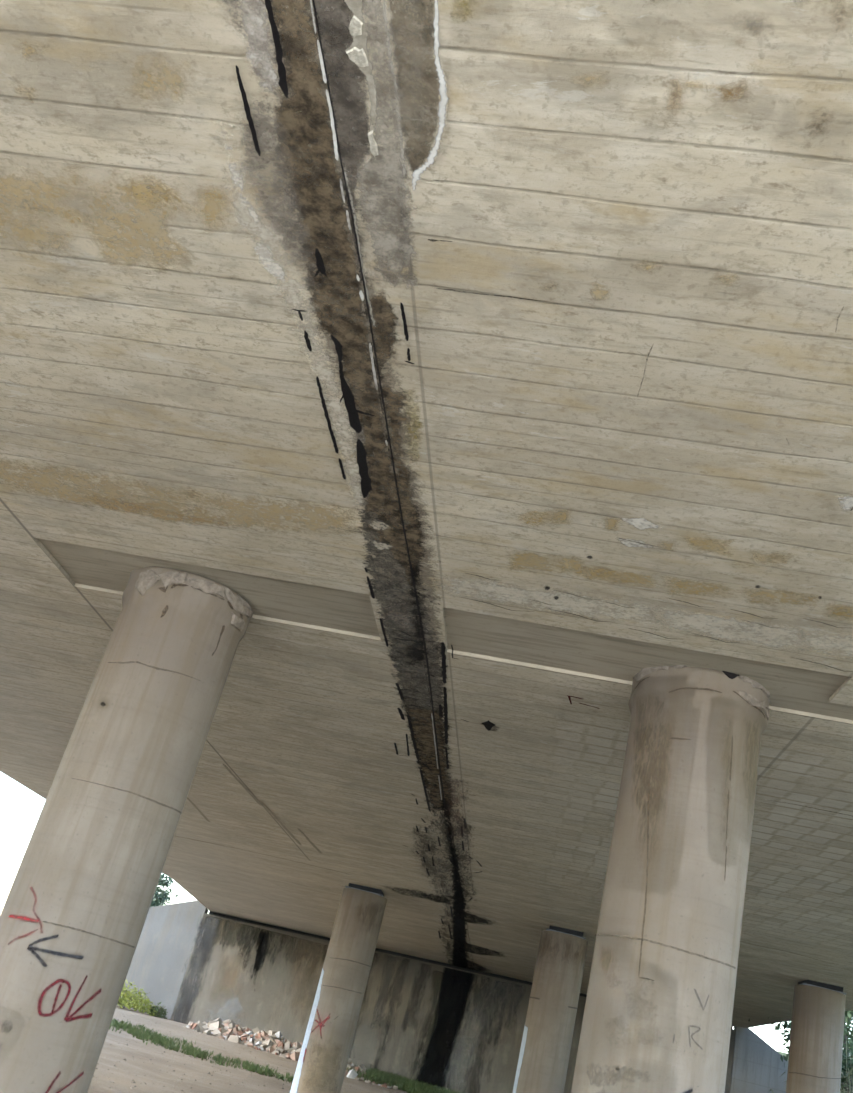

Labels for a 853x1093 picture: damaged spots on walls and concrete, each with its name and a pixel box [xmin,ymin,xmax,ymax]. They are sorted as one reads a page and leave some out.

crack [292,309,346,479]
peeling [344,0,416,325]
damp [271,0,523,1093]
crack [313,0,482,940]
crack [437,288,536,301]
damp [173,916,327,1023]